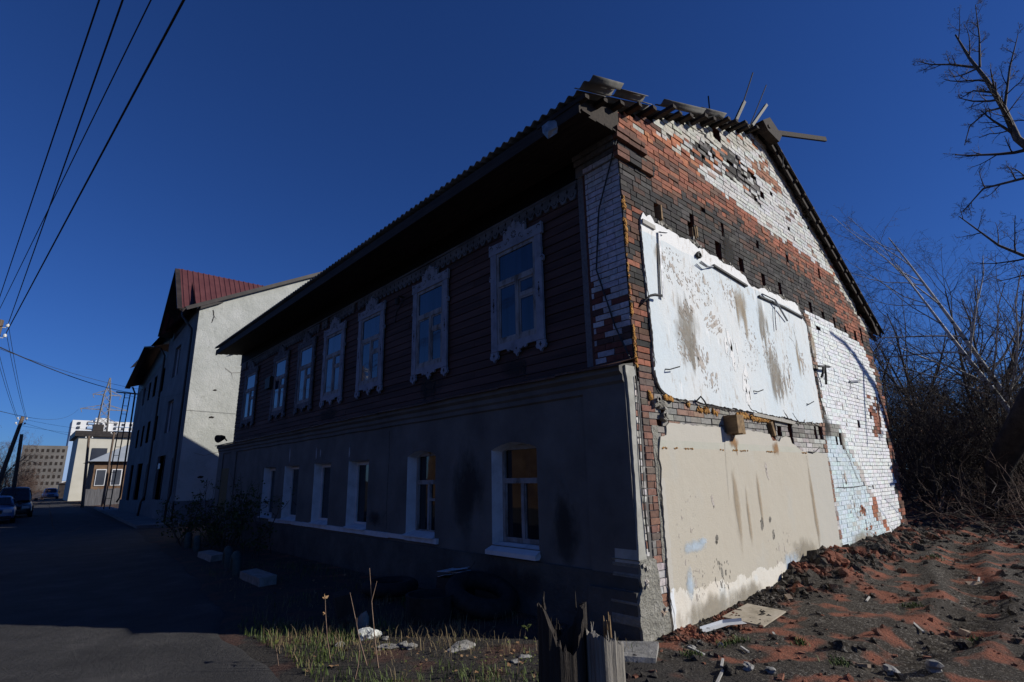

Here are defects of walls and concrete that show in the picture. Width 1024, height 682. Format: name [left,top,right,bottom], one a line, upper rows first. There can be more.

water stain [680,310,695,367]
water stain [736,295,787,398]
peeling [844,470,876,535]
flaking render [685,558,731,601]